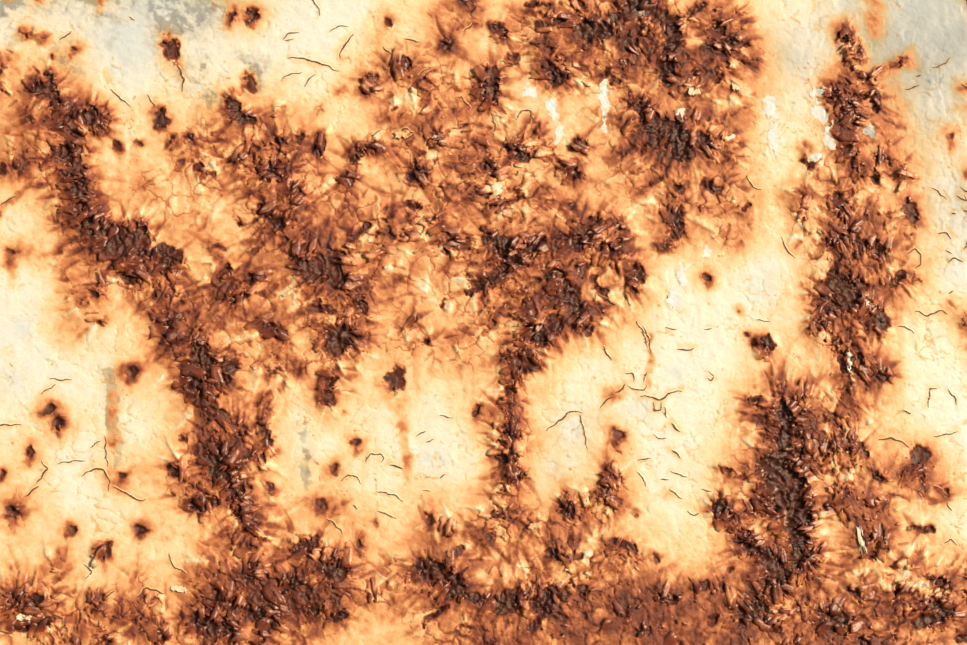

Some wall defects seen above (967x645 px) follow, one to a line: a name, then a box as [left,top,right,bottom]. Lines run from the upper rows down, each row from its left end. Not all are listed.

corrosion [86,0,125,23]
peeling [0,0,289,100]
corrosion [208,0,279,39]
corrosion [557,418,654,528]